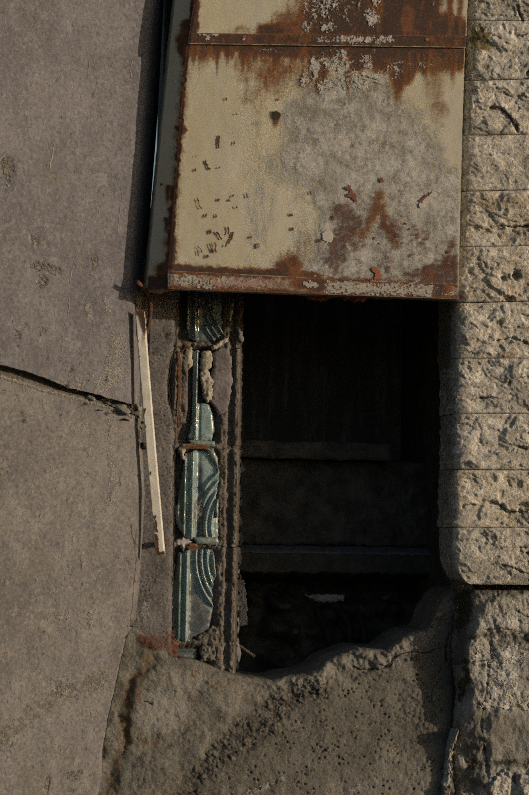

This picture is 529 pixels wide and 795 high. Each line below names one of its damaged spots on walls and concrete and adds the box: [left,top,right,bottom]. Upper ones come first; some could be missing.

peeling [300,0,433,95]
rust [148,0,466,299]
crack [355,637,449,670]
crack [472,609,529,794]